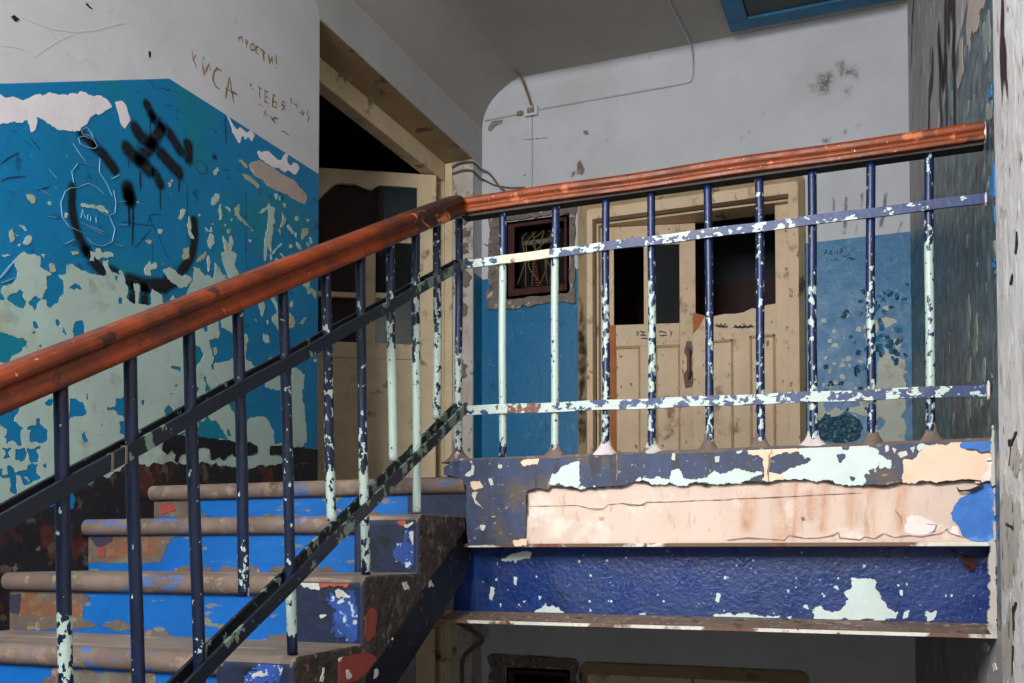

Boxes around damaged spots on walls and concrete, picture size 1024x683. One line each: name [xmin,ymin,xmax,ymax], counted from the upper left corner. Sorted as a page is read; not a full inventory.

peeling [0,91,130,132]
peeling [0,115,313,365]
spalling [485,207,578,310]
peeling [0,393,54,503]
peeling [68,363,124,465]
peeling [139,443,186,467]
peeling [137,315,254,430]
peeling [198,368,307,469]
peeling [465,461,502,531]
spalling [636,293,1023,683]
crack [729,512,964,541]
peeling [301,566,379,683]